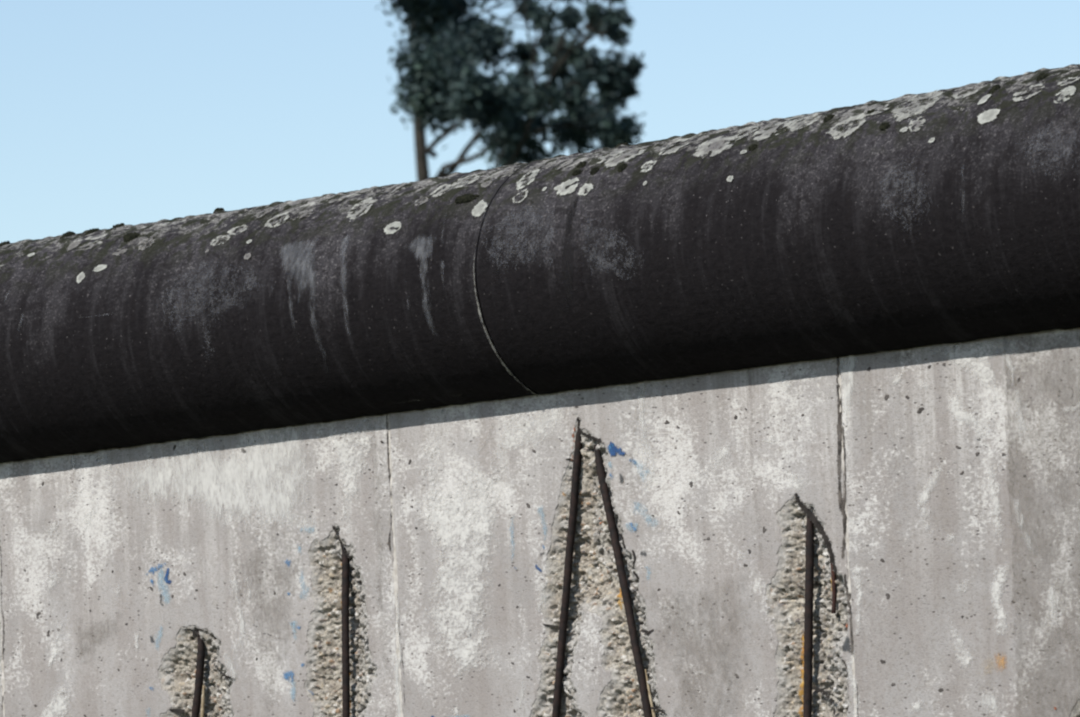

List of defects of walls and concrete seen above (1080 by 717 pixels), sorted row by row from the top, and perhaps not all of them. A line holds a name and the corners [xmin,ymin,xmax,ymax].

spalling [158,626,234,717]
spalling [305,524,378,717]
spalling [531,414,667,717]
spalling [766,495,852,717]
crack [794,357,858,713]